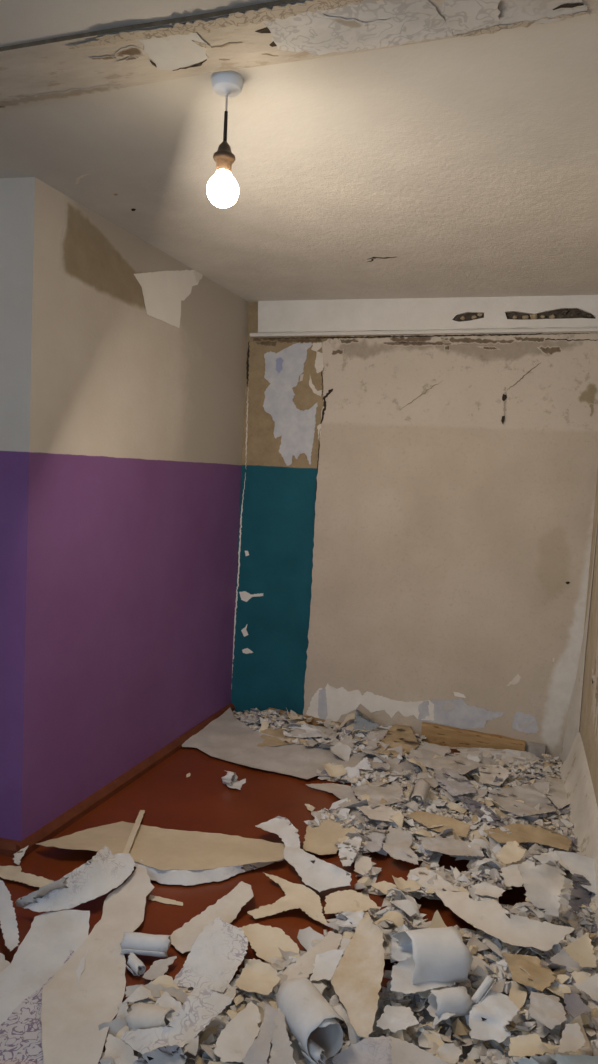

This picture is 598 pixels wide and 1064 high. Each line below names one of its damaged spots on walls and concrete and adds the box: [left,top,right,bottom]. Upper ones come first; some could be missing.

flaking render [60,197,148,313]
flaking render [454,313,484,322]
flaking render [505,309,595,320]
peeling [263,342,324,466]
peeling [239,591,263,602]
peeling [306,683,539,734]